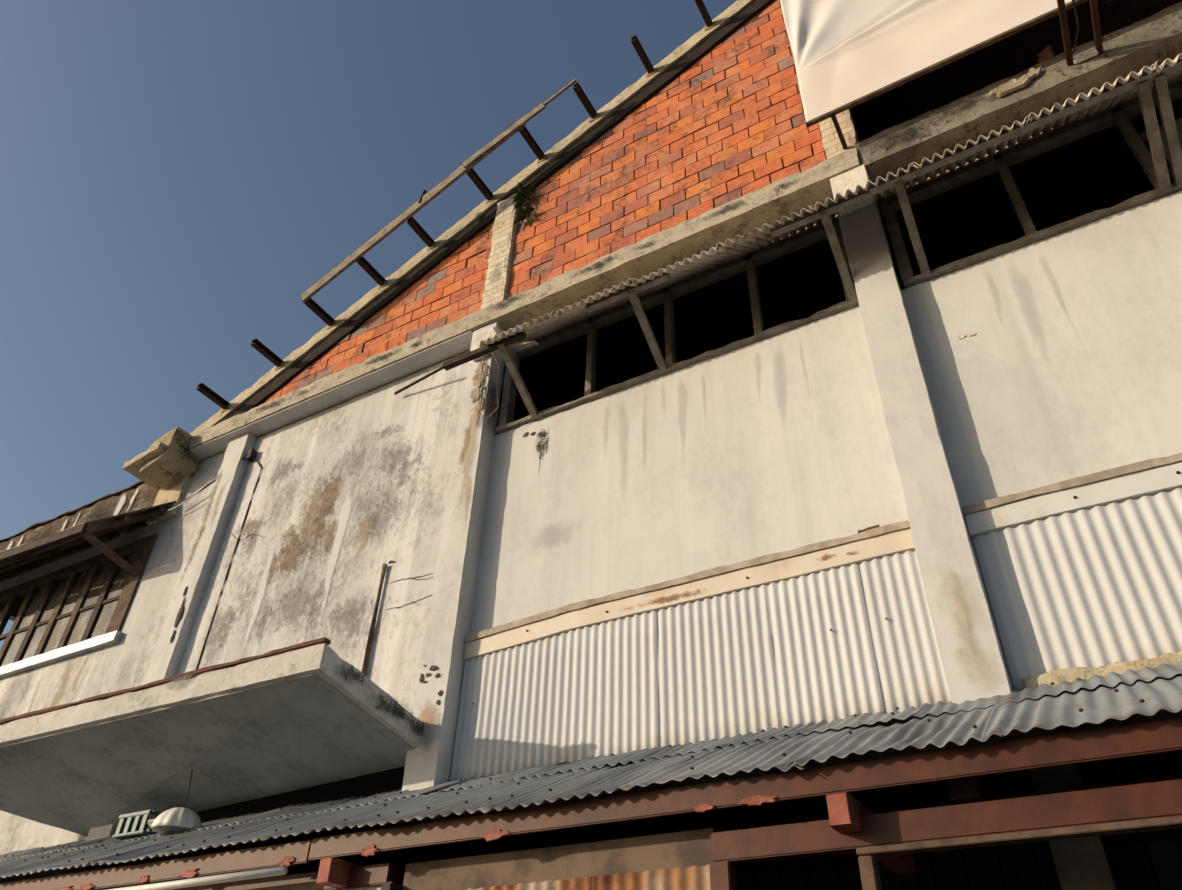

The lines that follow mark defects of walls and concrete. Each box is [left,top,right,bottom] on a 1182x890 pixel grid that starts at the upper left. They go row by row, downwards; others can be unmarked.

spalling [988,67,1042,98]
damp [523,427,549,466]
damp [228,519,264,562]
damp [246,437,422,645]
corrosion [648,588,705,604]